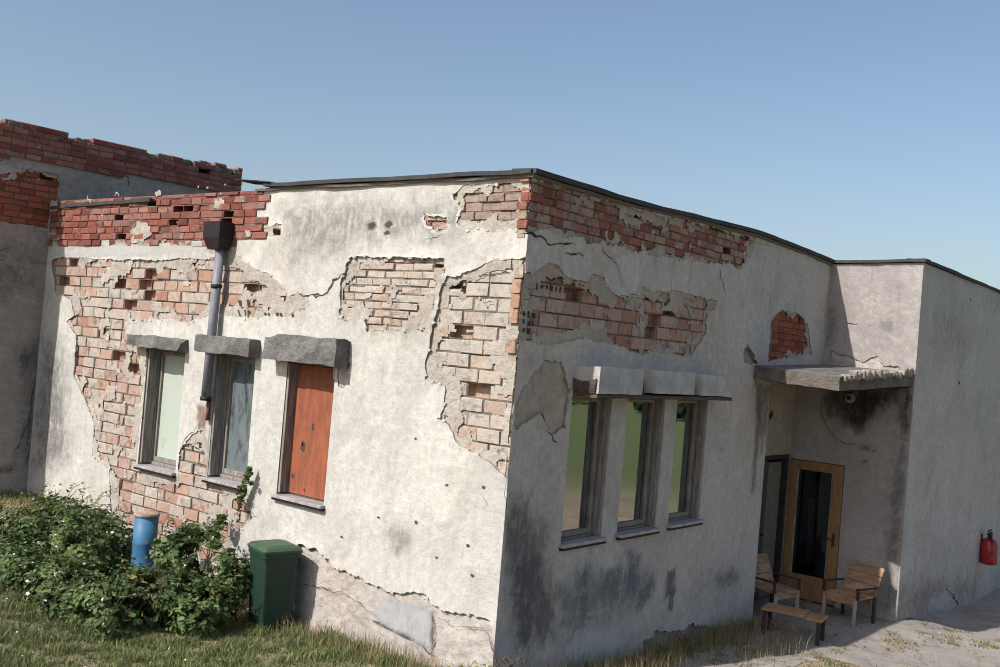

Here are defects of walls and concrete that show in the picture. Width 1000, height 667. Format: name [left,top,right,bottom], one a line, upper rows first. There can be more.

flaking render [423,177,757,270]
flaking render [0,160,311,564]
flaking render [330,255,717,478]
flaking render [743,309,812,365]
spalling [829,350,917,387]
flaking render [291,544,495,667]
damp [498,508,652,667]
damp [666,570,675,610]